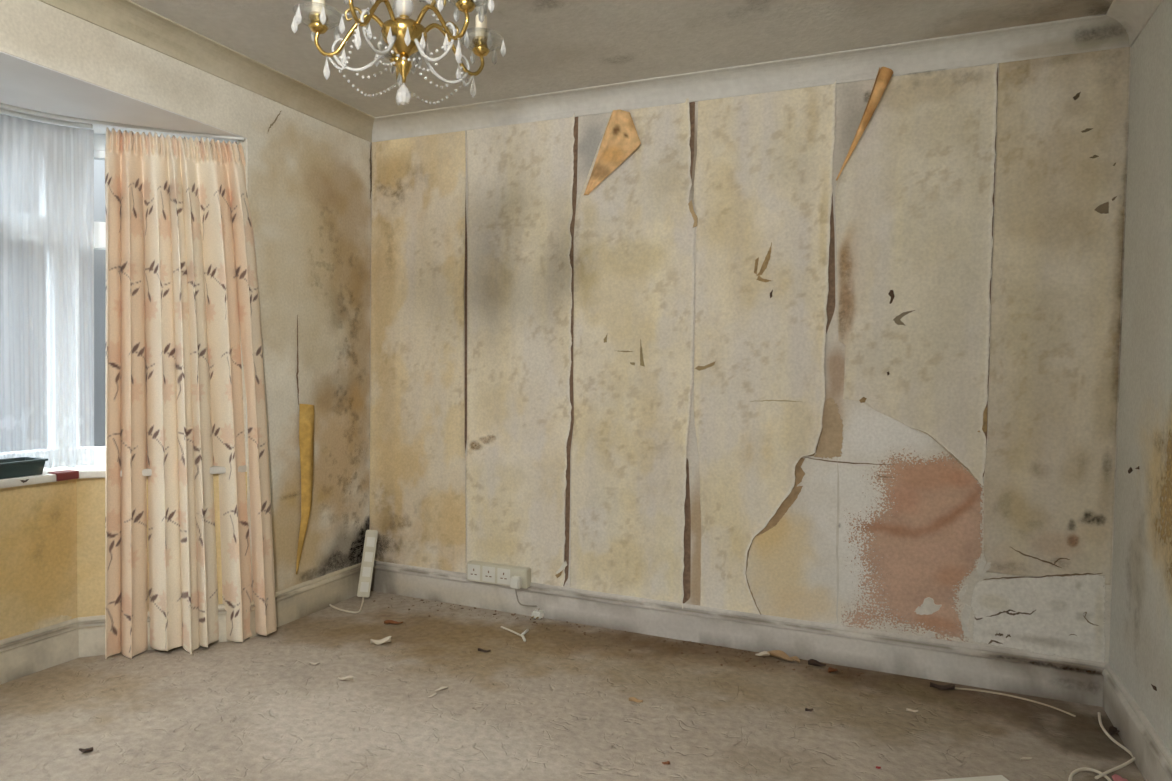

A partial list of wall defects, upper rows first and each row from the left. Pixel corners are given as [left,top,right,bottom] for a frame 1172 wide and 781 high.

peeling [584,109,641,195]
peeling [836,67,893,181]
peeling [296,404,314,574]
leakage [304,518,384,578]
flaking render [839,448,984,642]